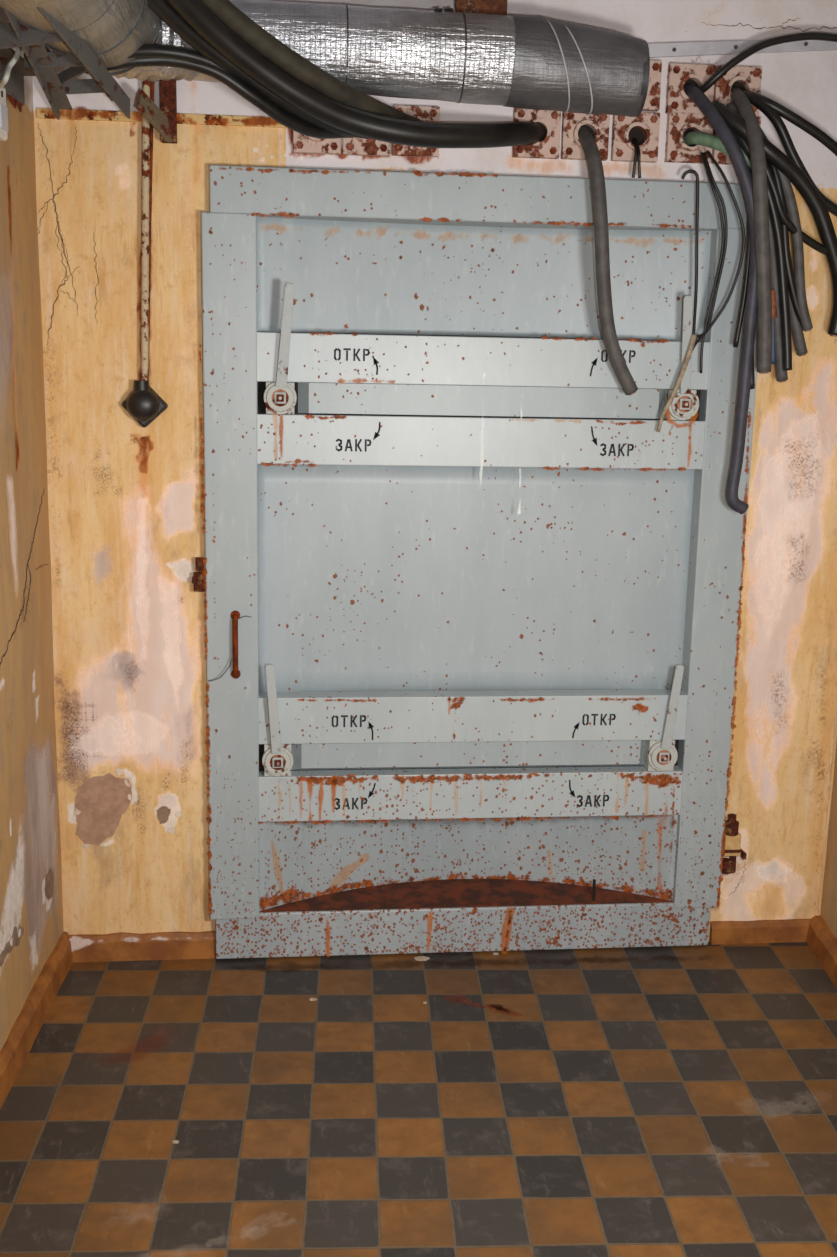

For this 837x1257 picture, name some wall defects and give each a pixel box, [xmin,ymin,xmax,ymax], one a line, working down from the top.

crack [37,123,99,345]
rust [258,389,317,467]
crack [0,488,46,665]
leakage [115,652,138,686]
rust [676,412,751,946]
spalling [68,768,137,849]
spalling [154,783,181,834]
rust [258,774,391,825]
rust [393,773,549,796]
rust [606,750,696,855]
rust [248,846,673,910]
spalling [0,925,24,966]